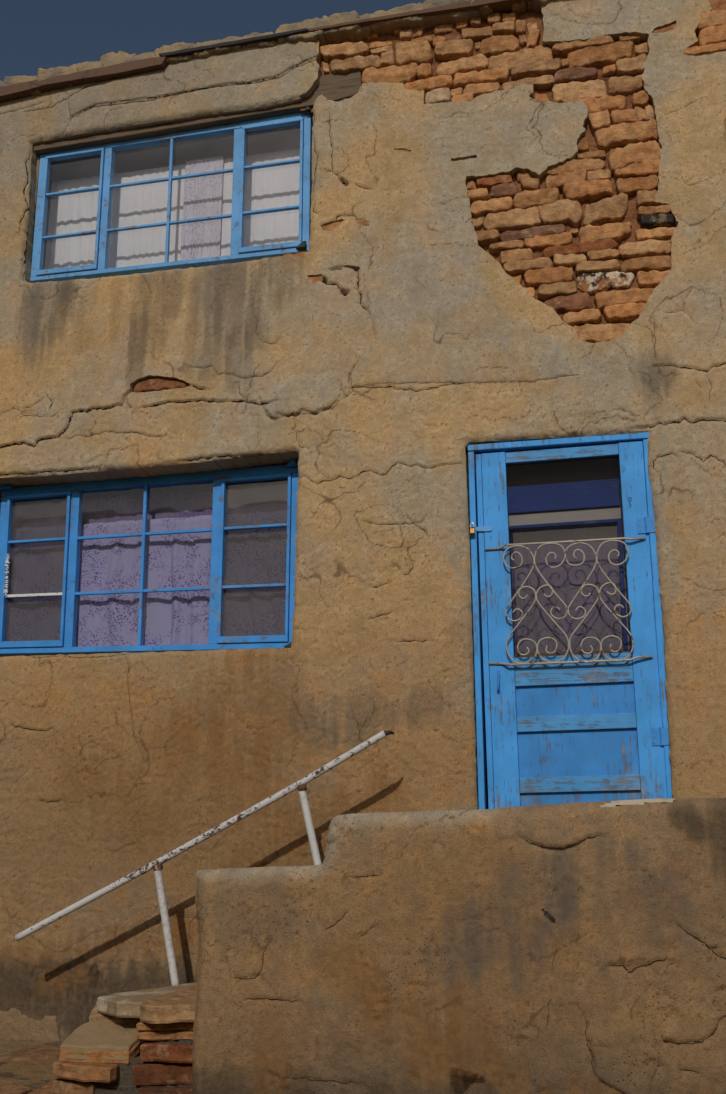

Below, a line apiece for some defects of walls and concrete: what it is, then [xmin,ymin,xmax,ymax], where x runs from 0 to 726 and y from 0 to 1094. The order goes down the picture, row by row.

flaking render [683,0,726,55]
flaking render [319,11,676,343]
flaking render [134,377,189,393]
crack [0,362,452,475]
crack [637,293,726,429]
crack [653,451,725,467]
crack [609,927,726,973]
water stain [0,962,189,1034]
crack [585,1017,623,1094]
crack [672,1015,726,1072]